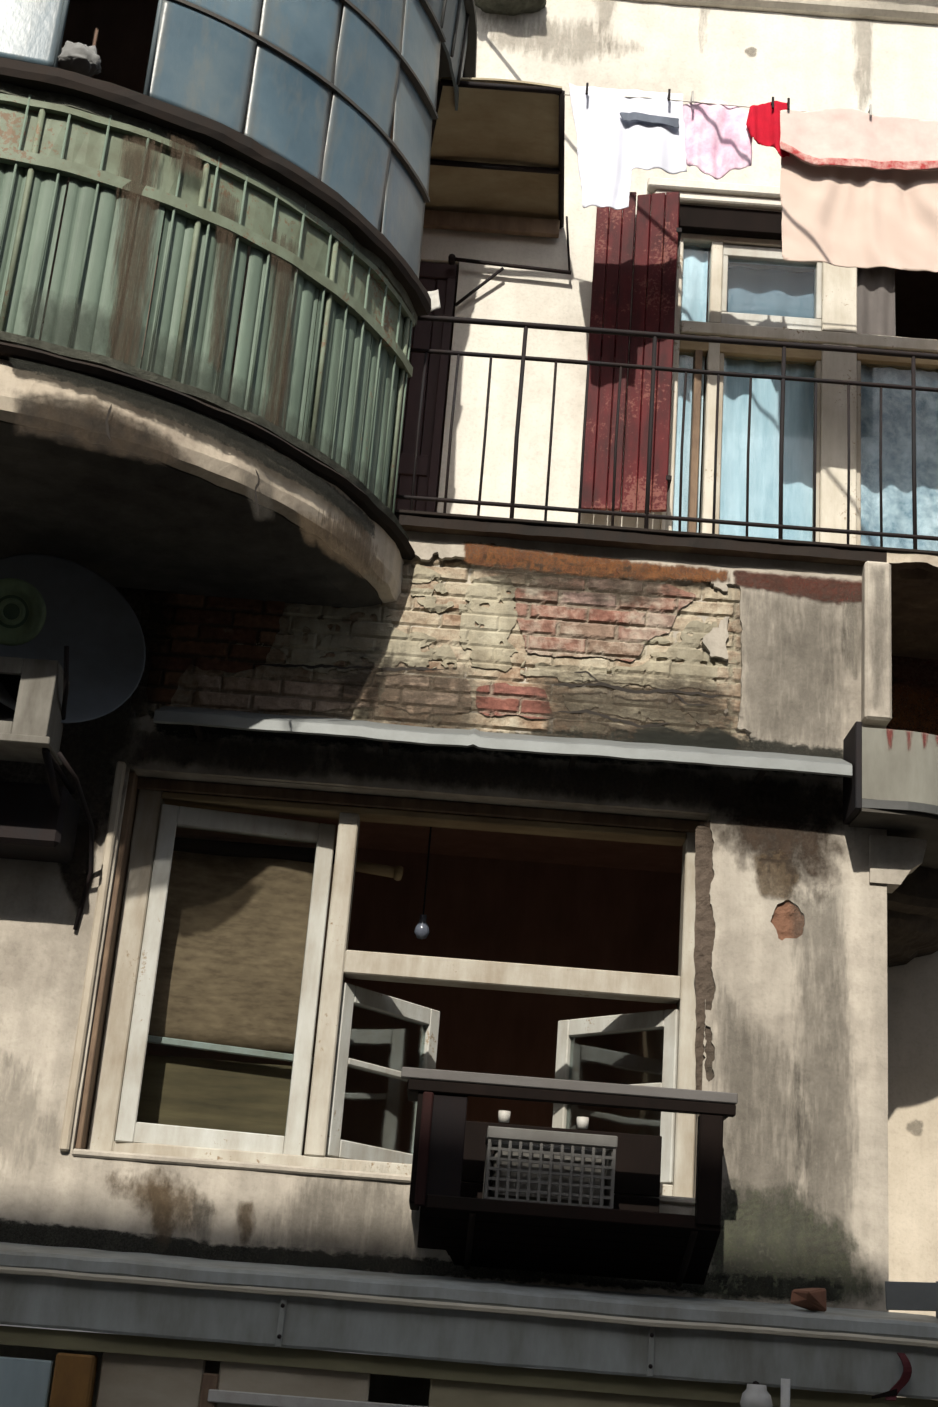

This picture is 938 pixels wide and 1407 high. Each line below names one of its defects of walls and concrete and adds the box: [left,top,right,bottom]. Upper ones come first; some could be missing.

corrosion [110,136,162,367]
corrosion [208,189,238,371]
corrosion [262,228,297,430]
damp [0,587,843,912]
flaking render [135,555,750,741]
corrosion [887,684,938,749]
flaking render [693,820,715,1090]
flaking render [770,900,804,940]
damp [0,1177,843,1302]